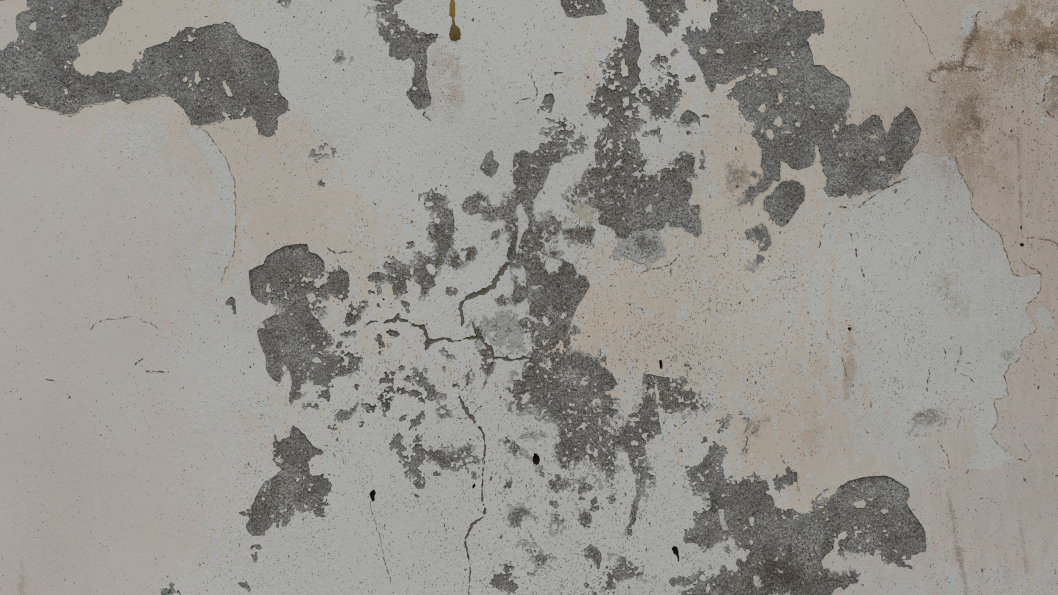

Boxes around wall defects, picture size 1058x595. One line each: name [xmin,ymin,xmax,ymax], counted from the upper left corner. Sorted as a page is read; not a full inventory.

peeling [0,0,290,137]
water stain [928,19,983,78]
peeling [239,0,1041,595]
crack [365,247,532,594]
peeling [161,582,181,595]